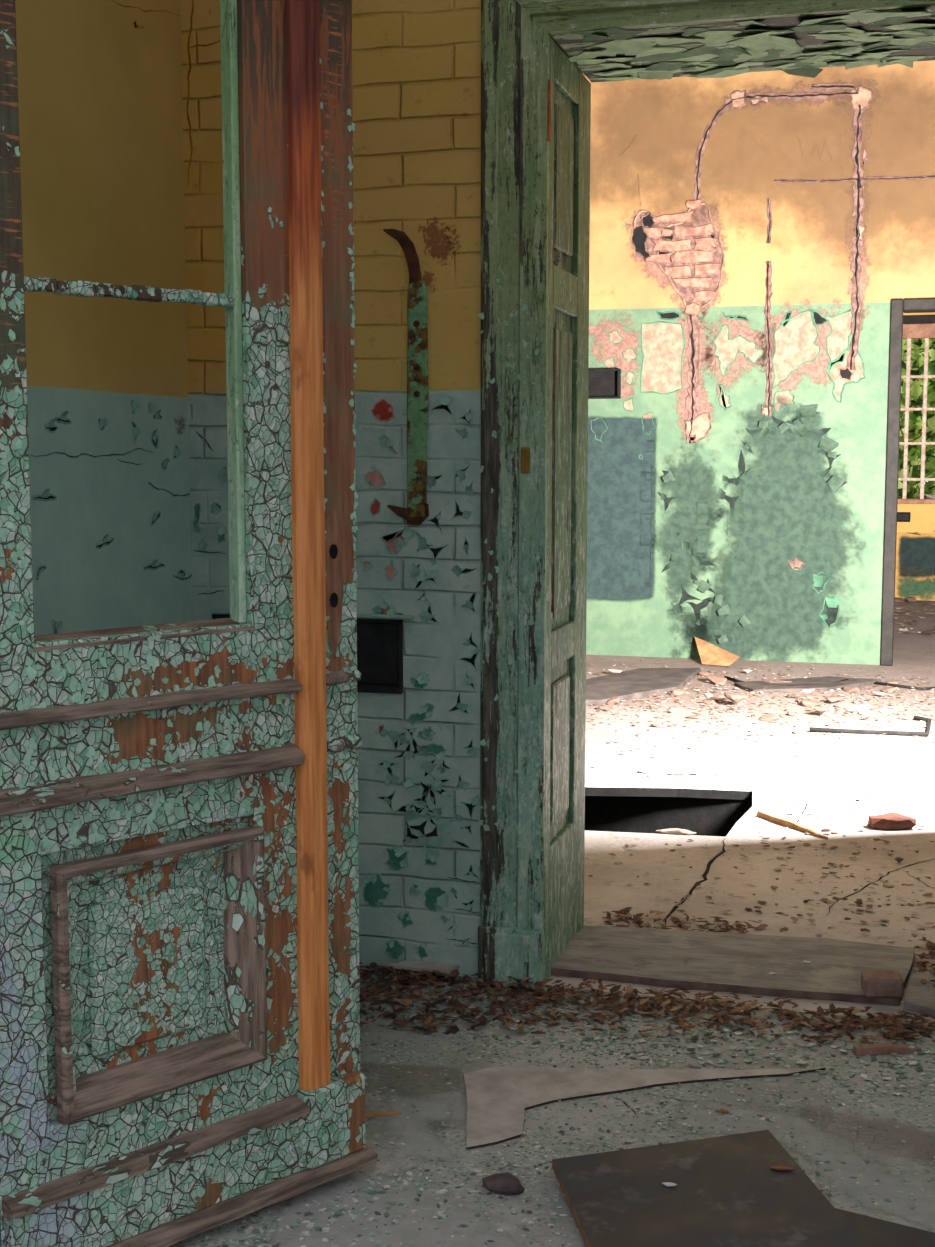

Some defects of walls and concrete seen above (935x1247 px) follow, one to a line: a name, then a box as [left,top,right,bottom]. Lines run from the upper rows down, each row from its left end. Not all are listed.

peeling [569,9,935,81]
spalling [850,85,873,111]
corrosion [418,218,461,292]
spalling [603,199,866,514]
water stain [587,73,935,662]
spalling [370,398,398,455]
spalling [349,466,500,624]
peeling [150,665,239,763]
peeling [362,632,498,908]
peeling [409,883,474,946]
crack [663,838,727,928]
crack [825,858,935,916]